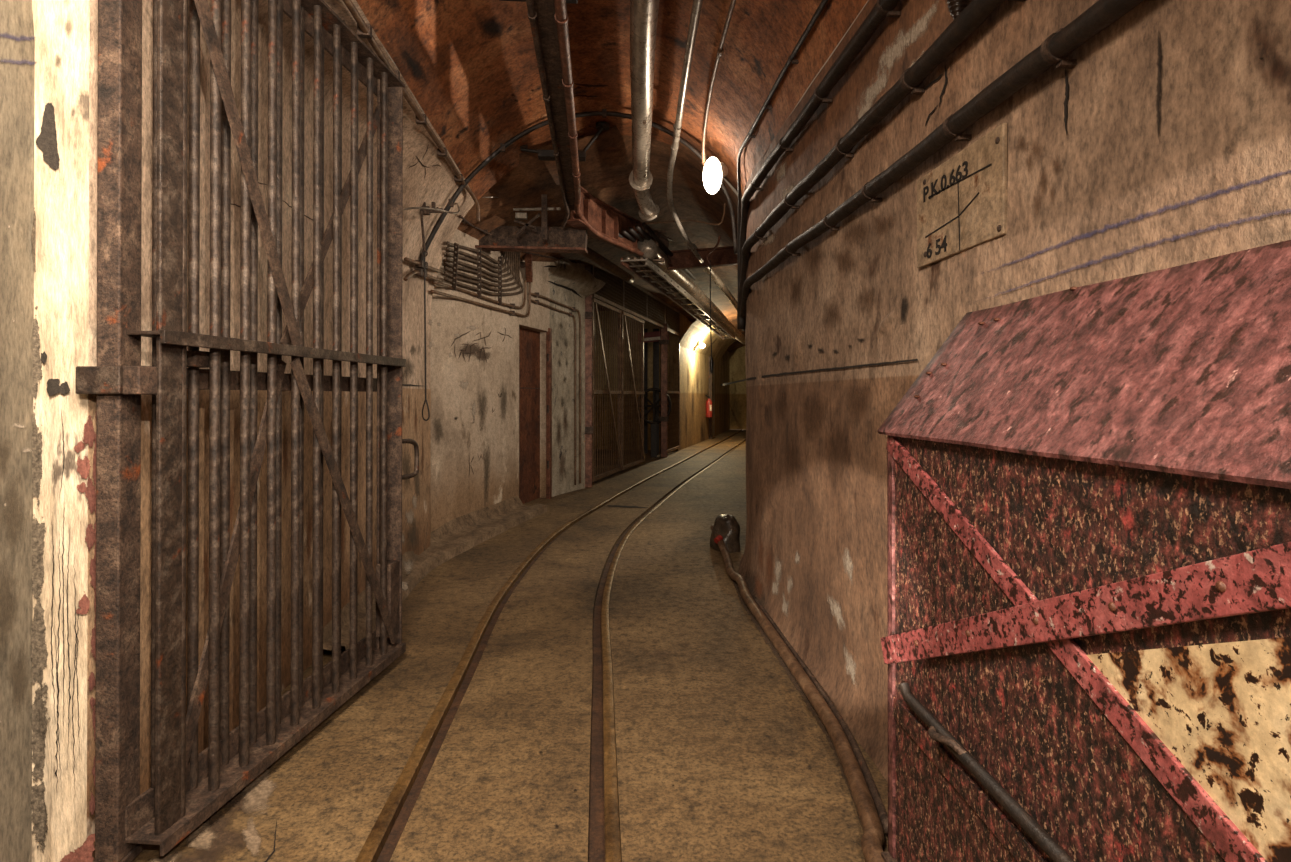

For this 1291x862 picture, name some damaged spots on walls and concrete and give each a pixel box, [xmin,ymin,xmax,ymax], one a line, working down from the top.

flaking render [30,306,70,853]
peeling [74,411,97,815]
peeling [60,834,95,862]